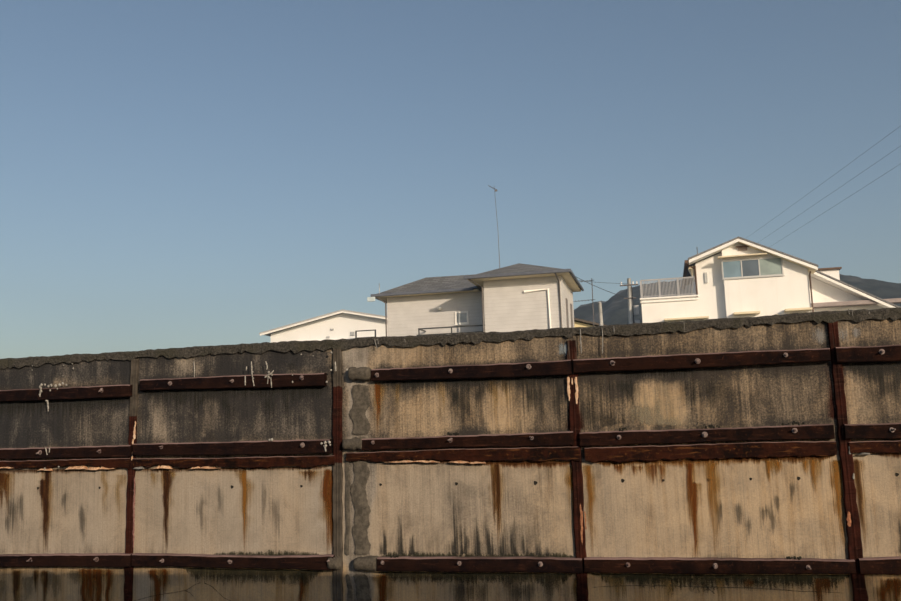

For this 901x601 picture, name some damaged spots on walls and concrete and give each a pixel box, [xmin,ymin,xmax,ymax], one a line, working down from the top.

water stain [0,363,127,416]
water stain [139,351,348,421]
water stain [373,375,563,418]
water stain [581,369,692,428]
corrosion [0,469,122,544]
corrosion [139,466,333,540]
water stain [398,529,414,555]
corrosion [389,460,573,521]
water stain [449,504,549,556]
corrosion [584,455,844,552]
corrosion [854,460,864,526]
corrosion [79,569,112,601]